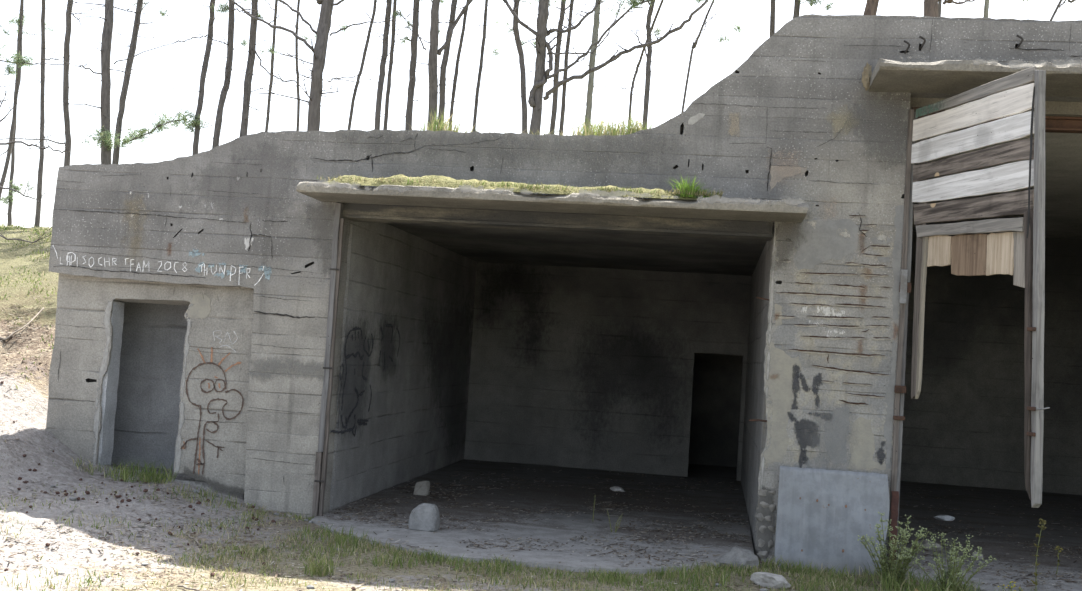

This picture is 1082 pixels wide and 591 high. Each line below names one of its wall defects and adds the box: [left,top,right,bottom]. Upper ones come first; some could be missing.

crack [315,133,503,174]
peeling [755,229,802,559]
peeling [792,205,904,470]